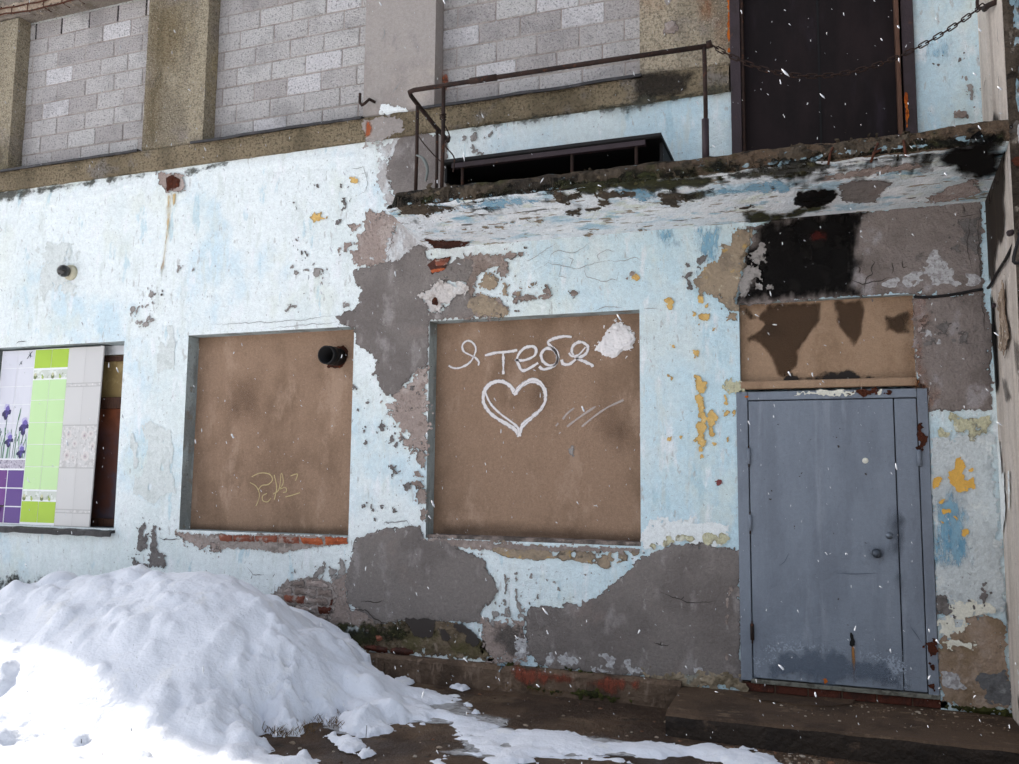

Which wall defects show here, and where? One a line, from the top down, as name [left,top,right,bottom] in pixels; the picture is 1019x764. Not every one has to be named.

spalling [533,168,643,217]
peeling [310,138,578,322]
peeling [682,225,774,331]
water stain [744,248,761,269]
water stain [743,206,844,261]
water stain [882,250,981,288]
water stain [745,301,872,380]
water stain [885,313,941,344]
rust [915,423,928,451]
peeling [131,517,167,570]
peeling [929,412,1019,711]
spalling [175,516,730,672]